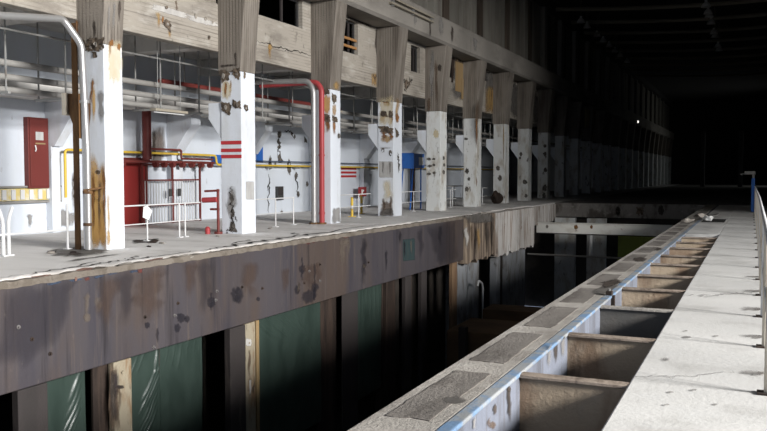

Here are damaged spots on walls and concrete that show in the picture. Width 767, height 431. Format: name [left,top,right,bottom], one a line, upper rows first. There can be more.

spalling [221,99,248,115]
corrosion [324,82,340,138]
corrosion [91,161,110,245]
damp [295,262,318,303]